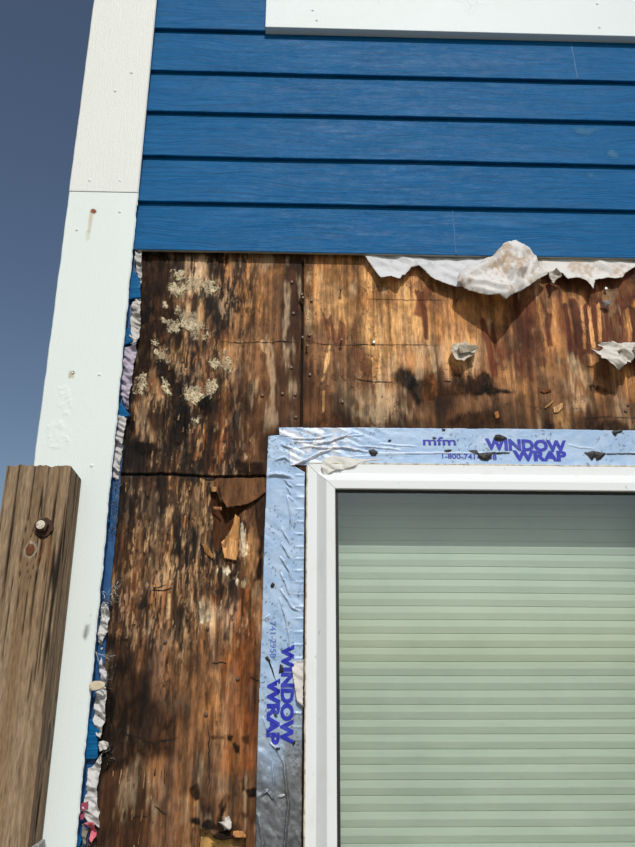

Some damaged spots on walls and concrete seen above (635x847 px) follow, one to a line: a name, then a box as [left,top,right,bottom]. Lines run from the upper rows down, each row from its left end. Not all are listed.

leakage [136,255,211,445]
leakage [395,369,510,403]
leakage [124,409,161,454]
leakage [450,412,499,429]
leakage [587,420,623,430]
leakage [236,455,262,478]
peeling [168,437,266,576]
leakage [216,492,266,588]
leakage [199,601,222,624]
leakage [99,634,171,776]
leakage [190,784,200,800]
leakage [191,799,233,846]